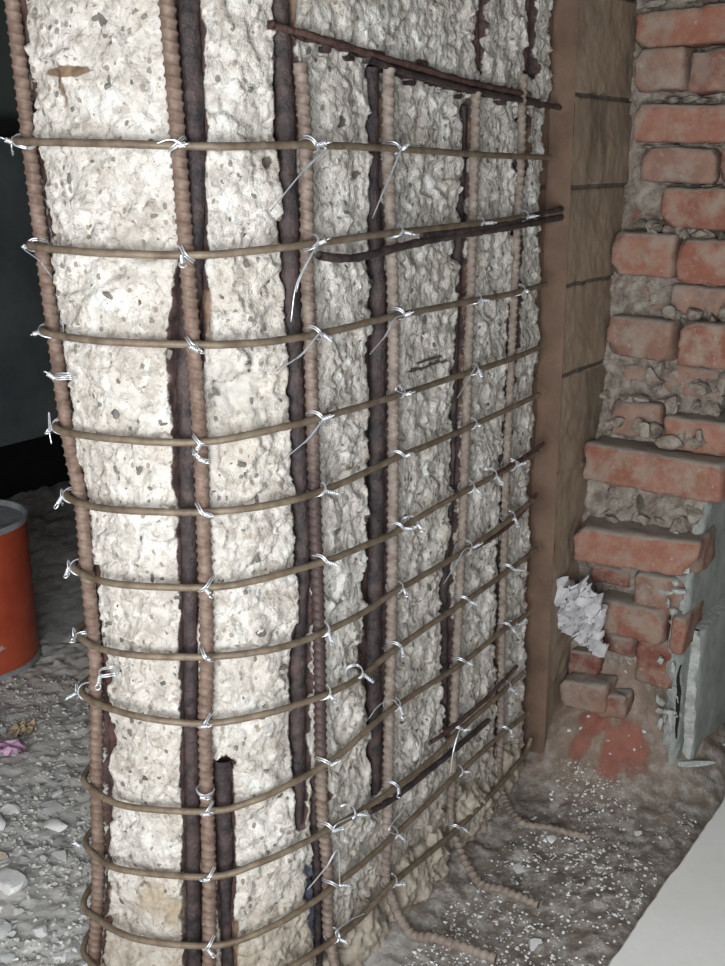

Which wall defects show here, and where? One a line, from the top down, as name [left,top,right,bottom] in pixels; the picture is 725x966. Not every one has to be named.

spalling [3,0,118,966]
corrosion [176,288,203,966]
corrosion [177,0,211,341]
spalling [132,0,266,966]
corrosion [212,757,239,966]
spalling [292,47,342,966]
corrosion [270,0,564,966]
spalling [379,67,498,965]
spalling [445,236,542,909]
spalling [508,74,537,215]
spalling [479,229,592,841]
flaking render [656,568,717,767]